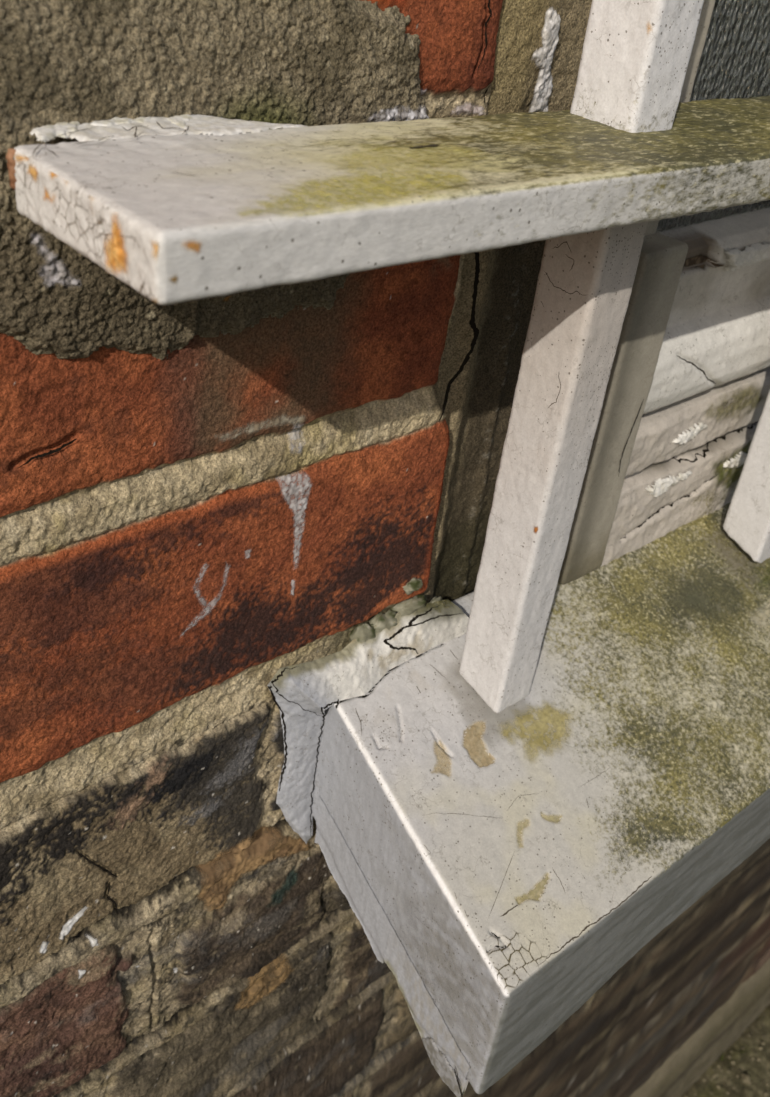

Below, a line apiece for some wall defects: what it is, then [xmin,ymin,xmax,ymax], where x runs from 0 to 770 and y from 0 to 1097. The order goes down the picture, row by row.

crack [20,121,192,179]
peeling [30,114,307,142]
corrosion [106,222,126,270]
crack [439,252,480,421]
crack [18,438,77,468]
peeling [672,421,708,444]
peeling [723,450,749,468]
peeling [644,470,692,497]
crack [268,605,465,836]
peeling [464,723,494,767]
crack [489,876,652,987]
peeling [422,1038,461,1097]